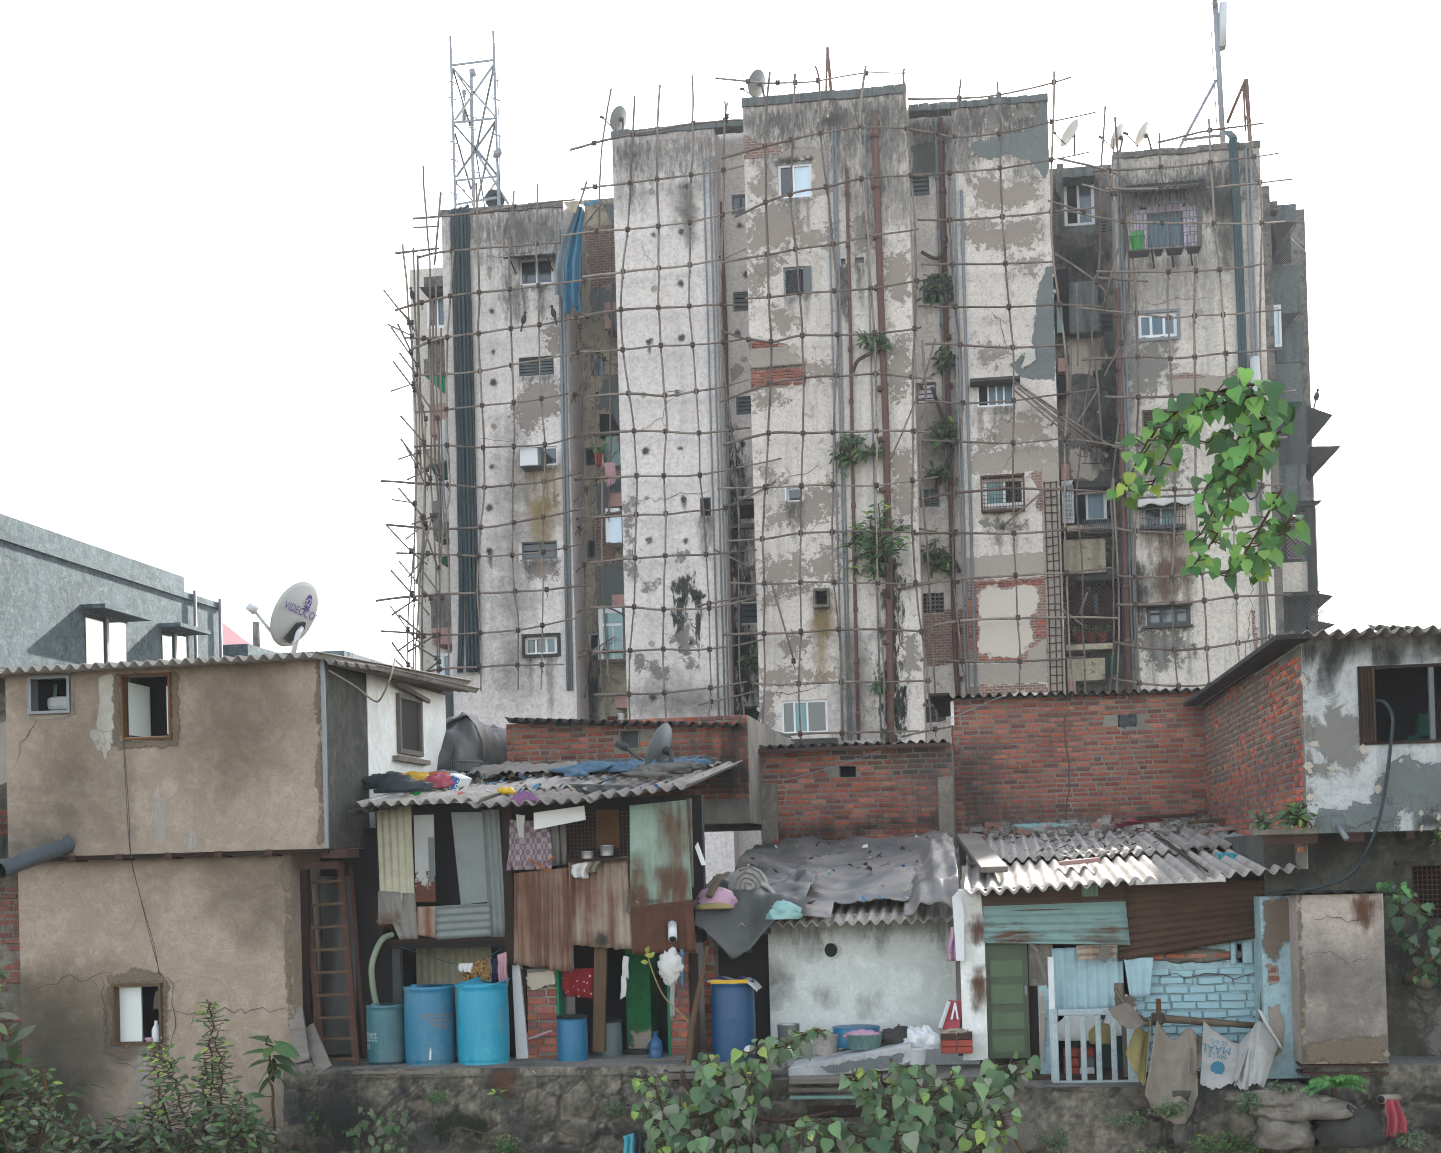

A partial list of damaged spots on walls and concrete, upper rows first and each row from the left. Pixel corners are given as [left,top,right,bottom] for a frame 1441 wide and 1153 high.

spalling [730,131,913,415]
peeling [957,167,1056,293]
peeling [974,340,1025,371]
damp [670,596,703,658]
flaking render [895,576,1048,697]
peeling [89,674,122,760]
peeling [1299,672,1366,801]
corrosion [633,809,687,906]
spalling [1417,810,1441,832]
crack [24,972,284,1093]